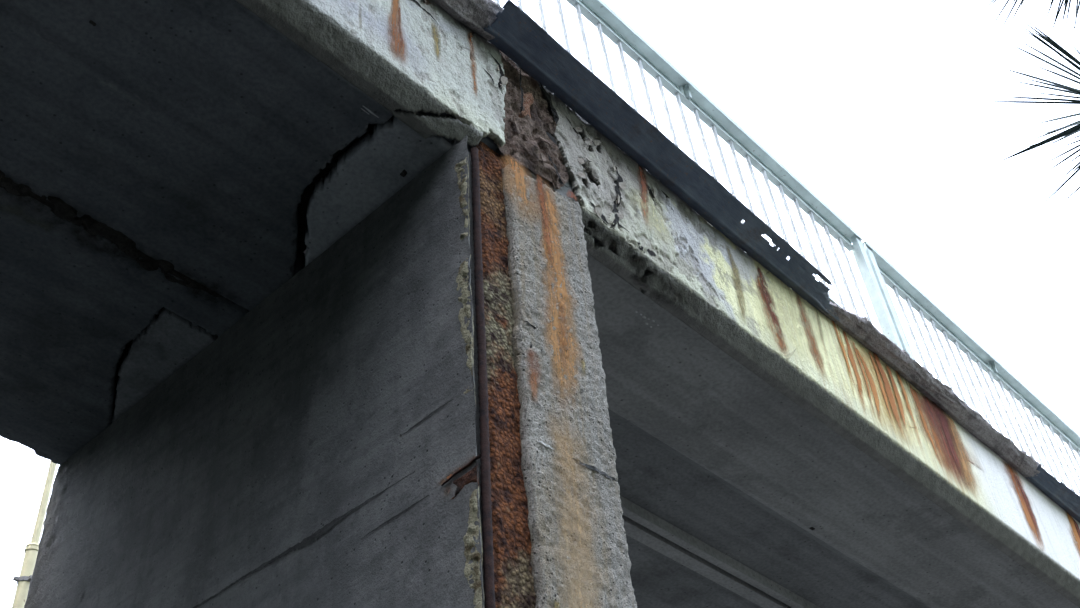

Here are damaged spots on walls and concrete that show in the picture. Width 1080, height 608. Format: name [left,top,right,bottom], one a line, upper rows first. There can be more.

corrosion [390,0,405,57]
corrosion [469,33,477,93]
spalling [441,50,588,608]
corrosion [507,158,577,388]
corrosion [727,247,745,316]
corrosion [757,267,786,351]
corrosion [797,296,974,487]
corrosion [1004,463,1040,541]
corrosion [1067,513,1080,555]